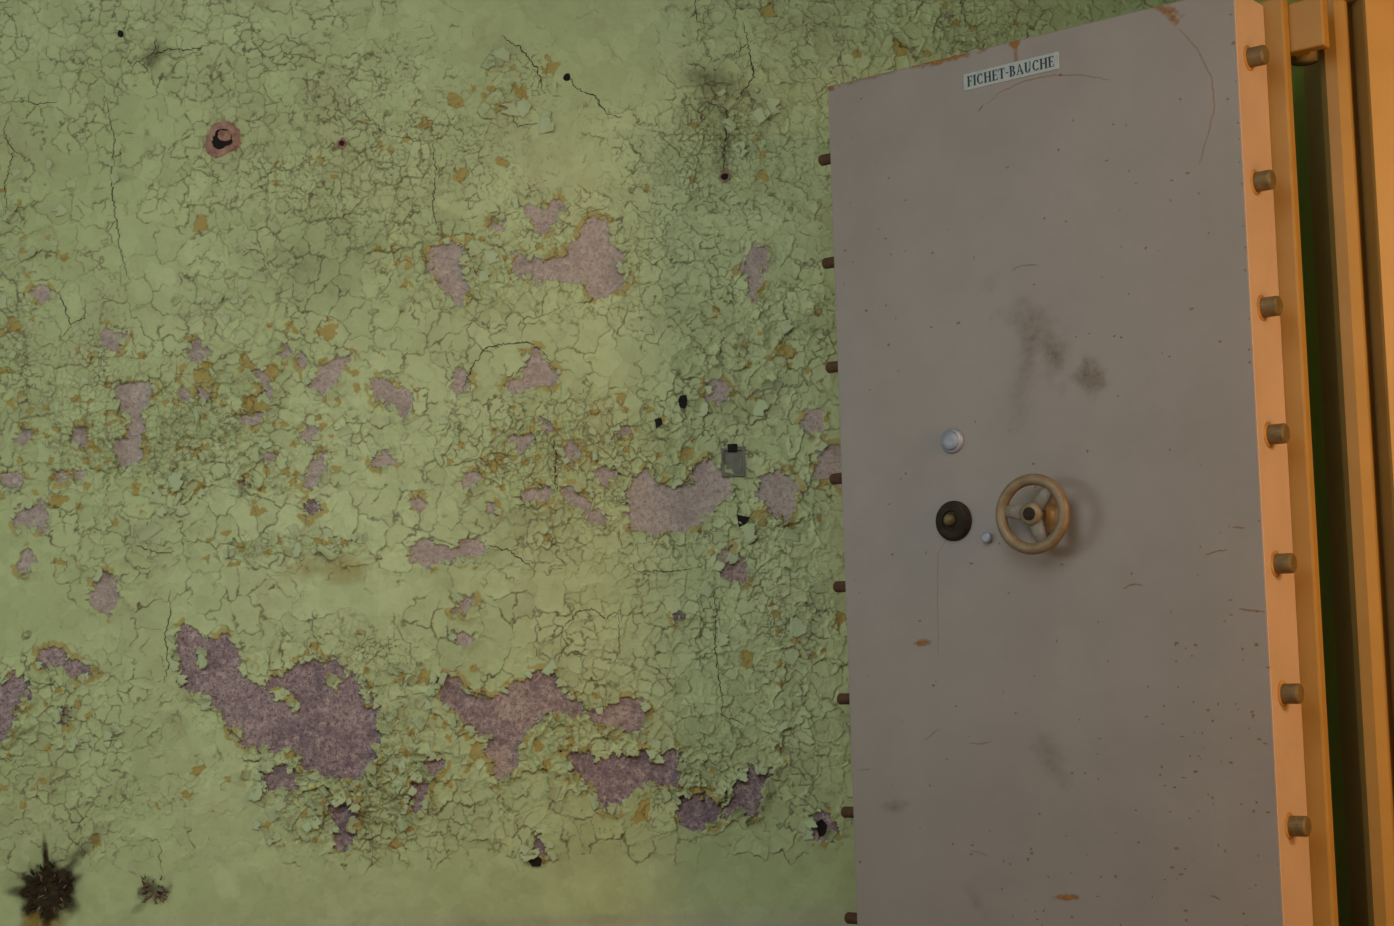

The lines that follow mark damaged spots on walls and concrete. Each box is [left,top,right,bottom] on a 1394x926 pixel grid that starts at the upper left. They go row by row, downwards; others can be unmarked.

crack [0,100,56,213]
crack [105,100,129,280]
peeling [426,198,634,308]
crack [501,35,619,118]
crack [702,23,755,169]
crack [463,341,550,391]
peeling [461,408,733,539]
peeling [713,404,842,588]
peeling [0,646,99,767]
peeling [166,623,445,852]
peeling [406,658,777,838]
crack [699,595,741,723]